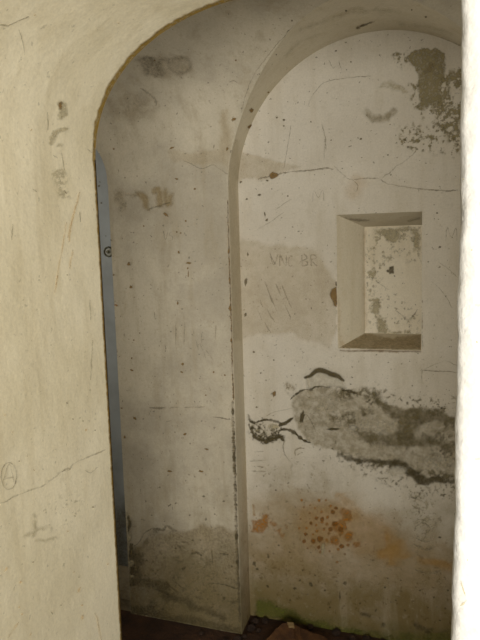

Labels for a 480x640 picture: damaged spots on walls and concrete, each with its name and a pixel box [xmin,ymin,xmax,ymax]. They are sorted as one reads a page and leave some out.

peeling [393,48,462,151]
peeling [377,227,420,248]
leakage [93,0,232,640]
peeling [369,299,409,333]
leakage [303,387,455,494]
corrosion [253,515,268,532]
corrosion [299,499,358,554]